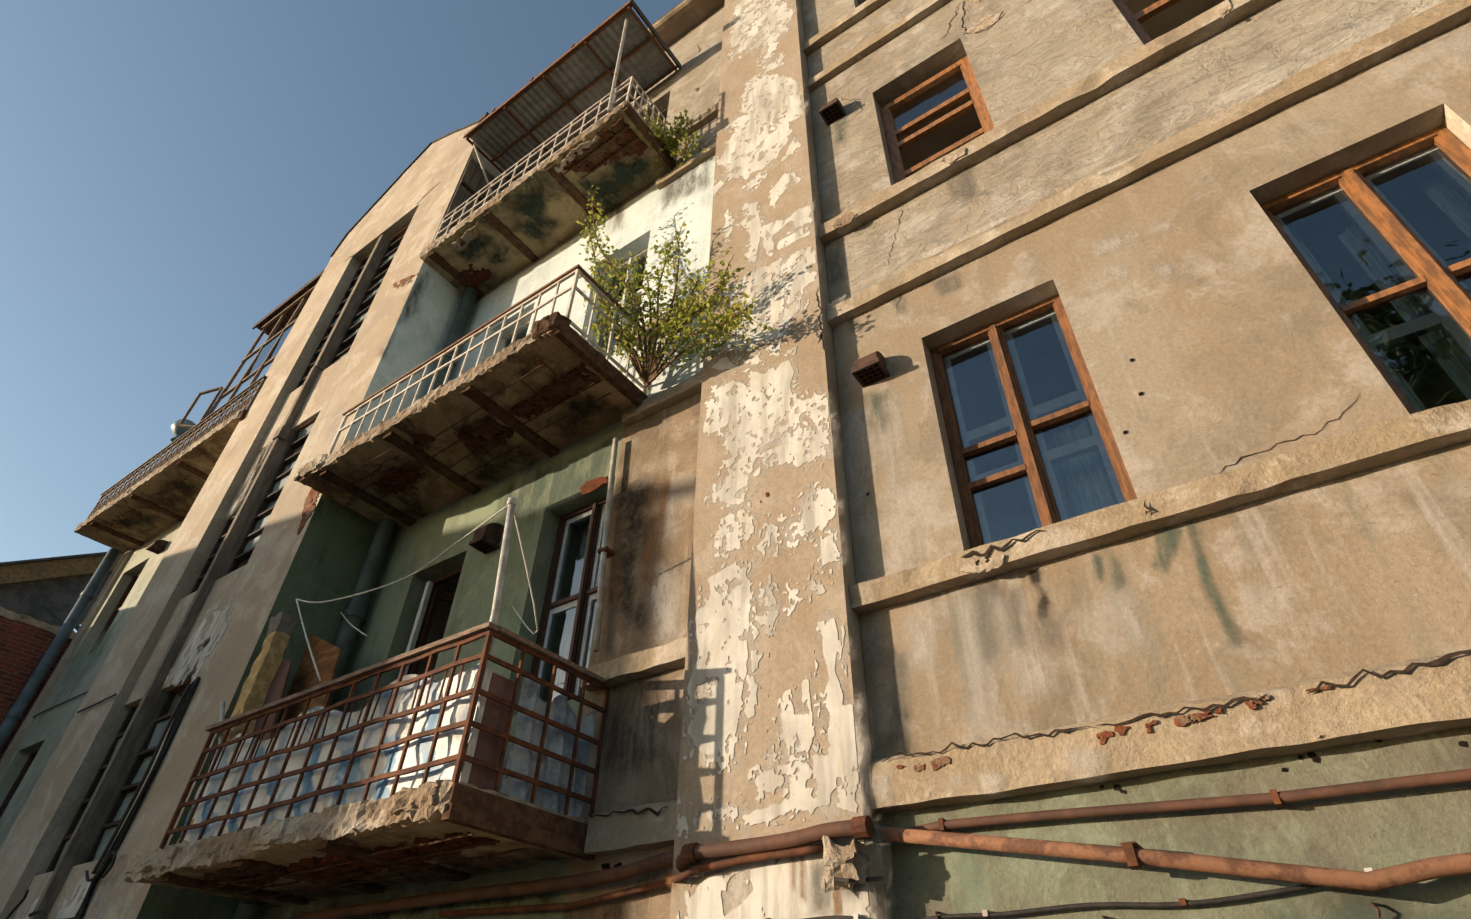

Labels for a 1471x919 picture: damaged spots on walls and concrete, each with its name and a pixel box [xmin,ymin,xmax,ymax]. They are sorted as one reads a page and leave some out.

peeling [676,0,860,839]
crack [1216,393,1360,475]
water stain [610,482,675,639]
crack [961,530,1046,558]
water stain [1029,571,1048,622]
peeling [165,598,234,687]
water stain [893,632,927,738]
crack [1306,650,1471,694]
crack [883,694,1266,762]
spalling [1096,708,1223,745]
peeling [56,875,91,919]
peeling [677,837,870,919]